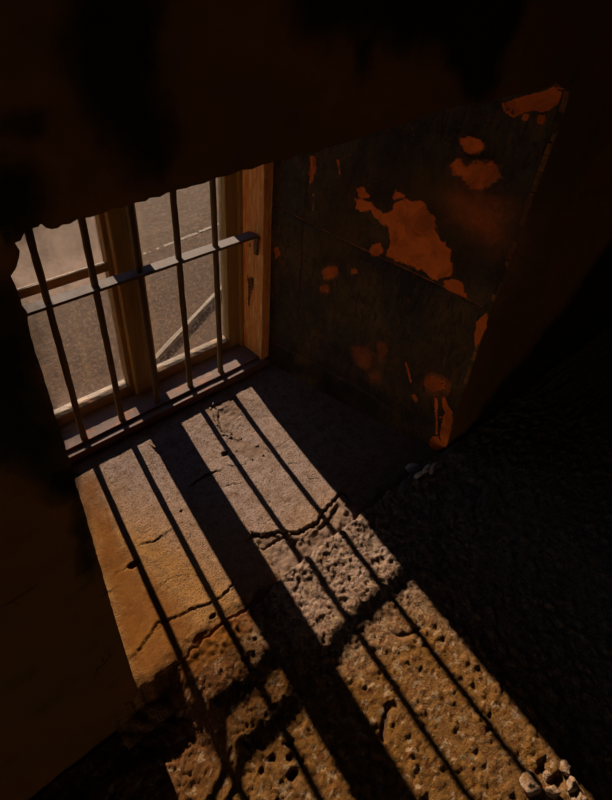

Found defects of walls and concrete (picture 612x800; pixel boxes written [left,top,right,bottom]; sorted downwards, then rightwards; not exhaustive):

crack [251,494,353,551]
crack [138,586,232,651]